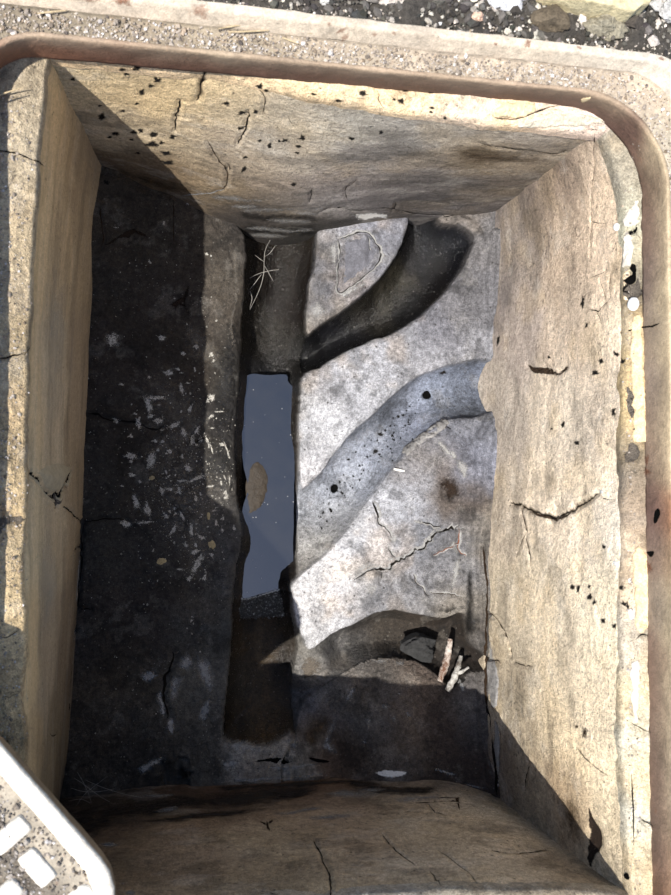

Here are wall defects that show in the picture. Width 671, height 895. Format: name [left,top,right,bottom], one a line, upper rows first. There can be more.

crack [29,470,127,631]
crack [512,493,613,562]
crack [354,500,530,793]
crack [159,652,174,718]
crack [314,842,332,895]